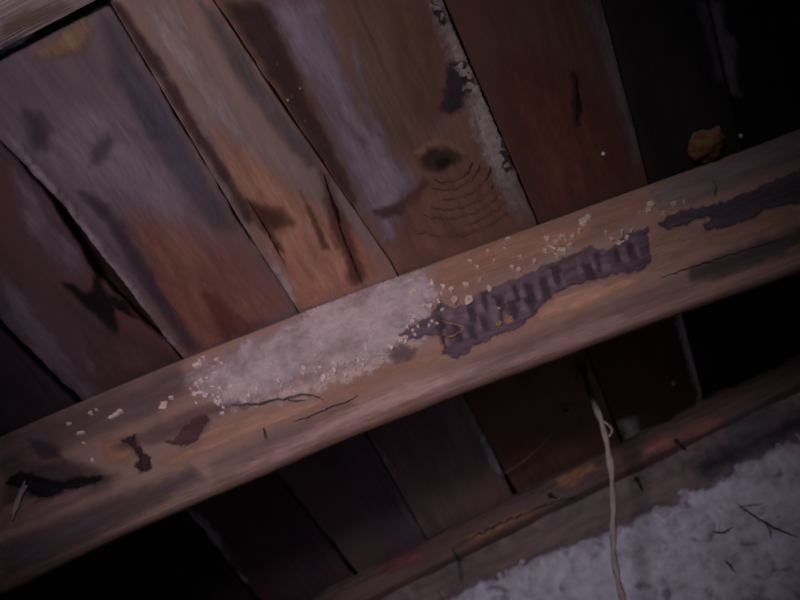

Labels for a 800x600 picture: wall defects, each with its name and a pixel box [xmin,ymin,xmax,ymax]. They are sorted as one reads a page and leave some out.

damp [3,0,528,354]
damp [652,131,800,207]
crack [666,236,790,276]
damp [1,369,182,528]
crack [233,393,356,421]
damp [228,313,633,475]
damp [0,470,195,574]